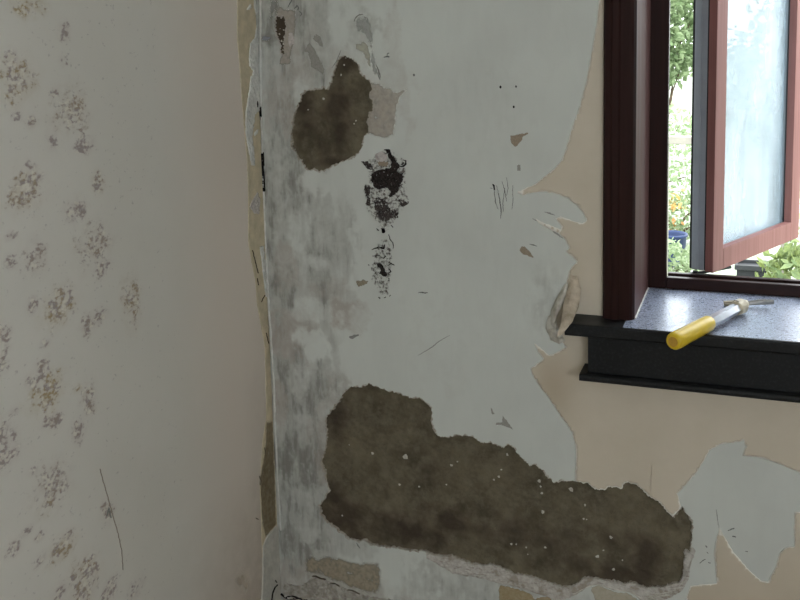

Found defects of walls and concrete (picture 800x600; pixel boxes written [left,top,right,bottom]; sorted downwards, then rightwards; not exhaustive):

peeling [237,0,277,550]
mould [356,149,409,299]
spalling [280,575,393,600]
spalling [318,383,696,600]